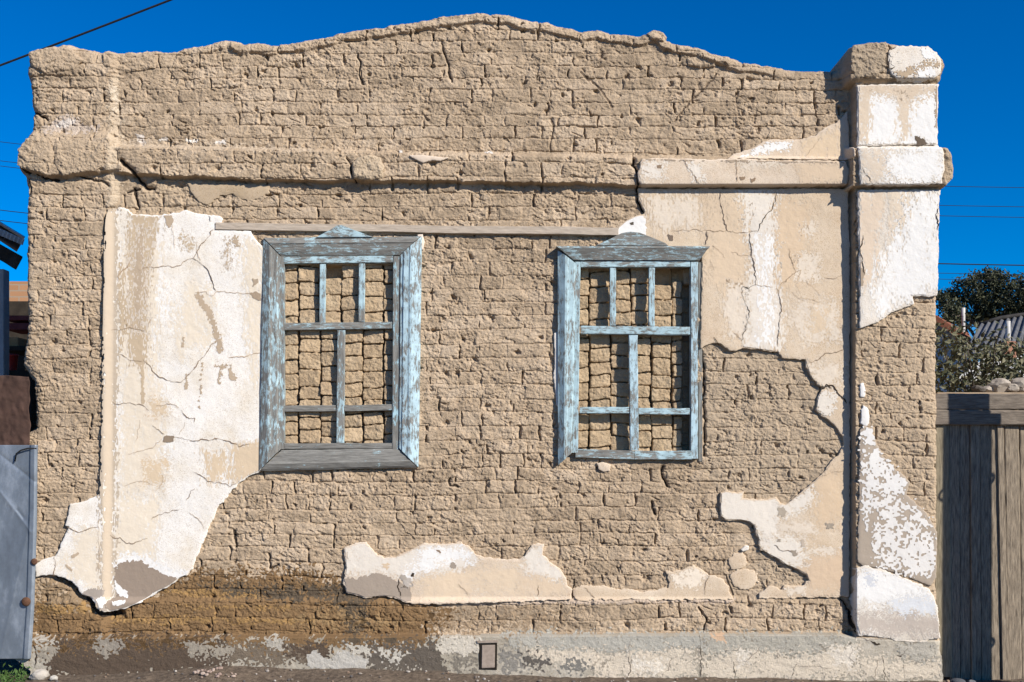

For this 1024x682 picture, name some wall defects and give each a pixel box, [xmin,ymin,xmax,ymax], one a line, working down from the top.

peeling [618,159,710,241]
crack [117,216,253,296]
crack [672,161,865,456]
spalling [702,47,944,612]
crack [103,327,258,454]
leakage [29,208,939,676]
crack [68,472,233,573]
spalling [82,550,188,611]
spalling [345,543,736,607]